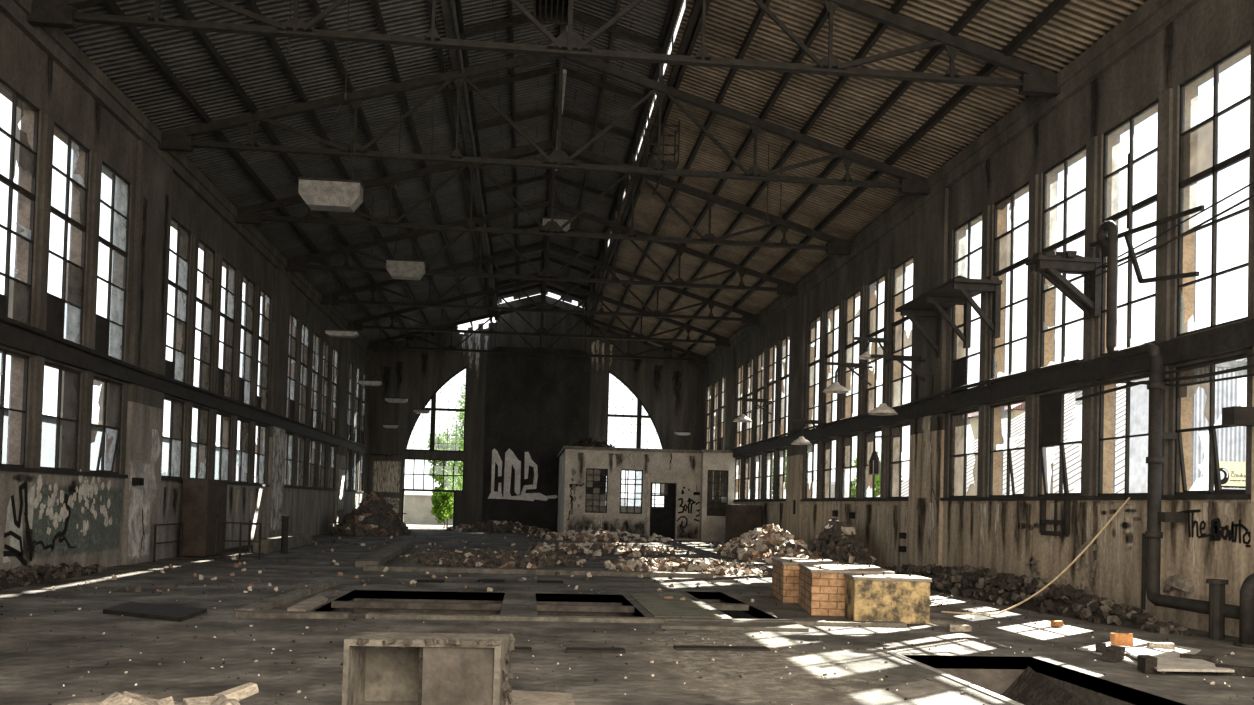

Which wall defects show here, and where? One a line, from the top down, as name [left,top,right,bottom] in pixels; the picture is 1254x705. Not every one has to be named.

damp [1051,502,1135,574]